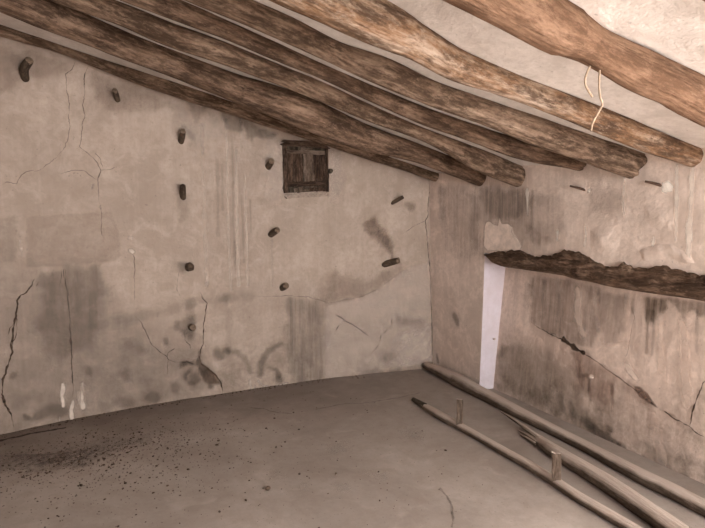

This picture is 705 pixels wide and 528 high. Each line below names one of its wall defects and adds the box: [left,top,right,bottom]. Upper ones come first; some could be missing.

crack [66,72,111,190]
peeling [484,219,521,251]
crack [0,280,66,441]
crack [60,270,74,388]
crack [140,298,223,393]
crack [535,325,705,437]